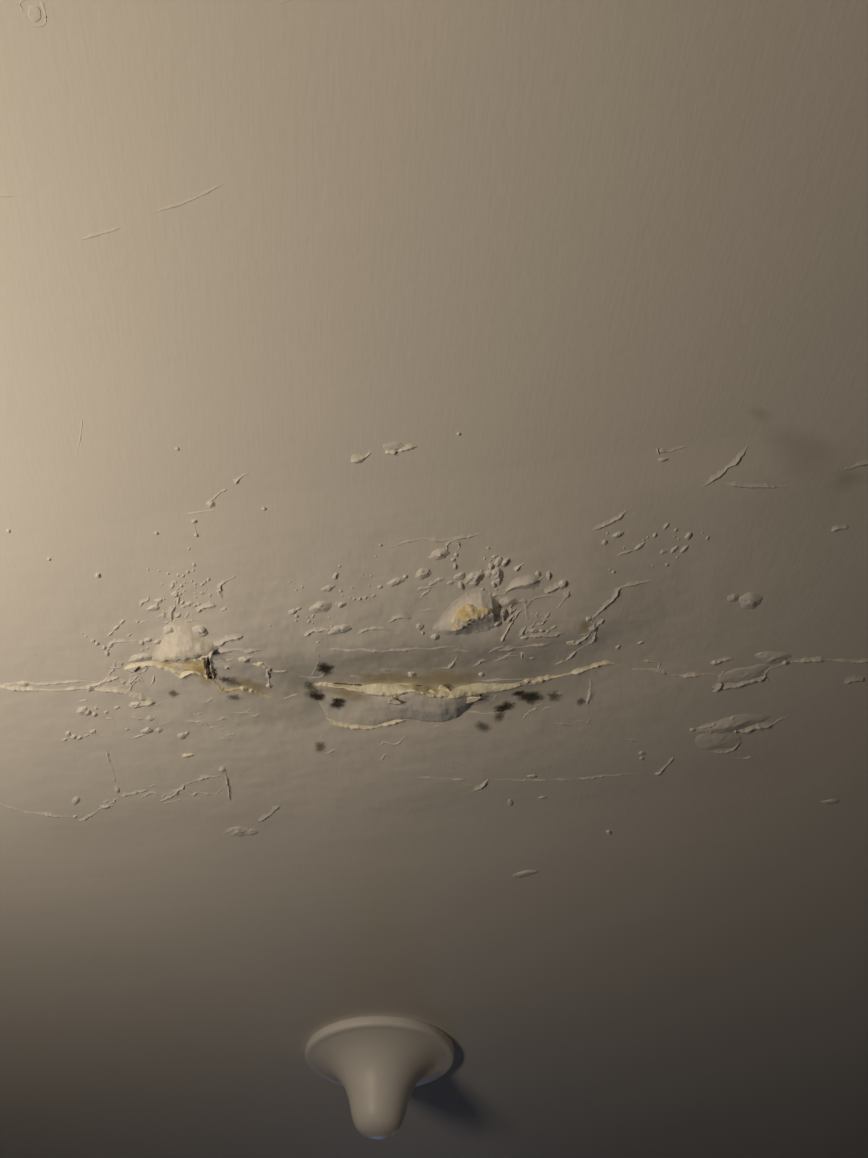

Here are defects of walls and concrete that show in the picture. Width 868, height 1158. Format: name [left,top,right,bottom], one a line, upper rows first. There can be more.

peeling [124,571,571,742]
crack [520,580,868,692]
crack [0,662,173,737]
damp [307,684,344,708]
damp [496,691,556,718]